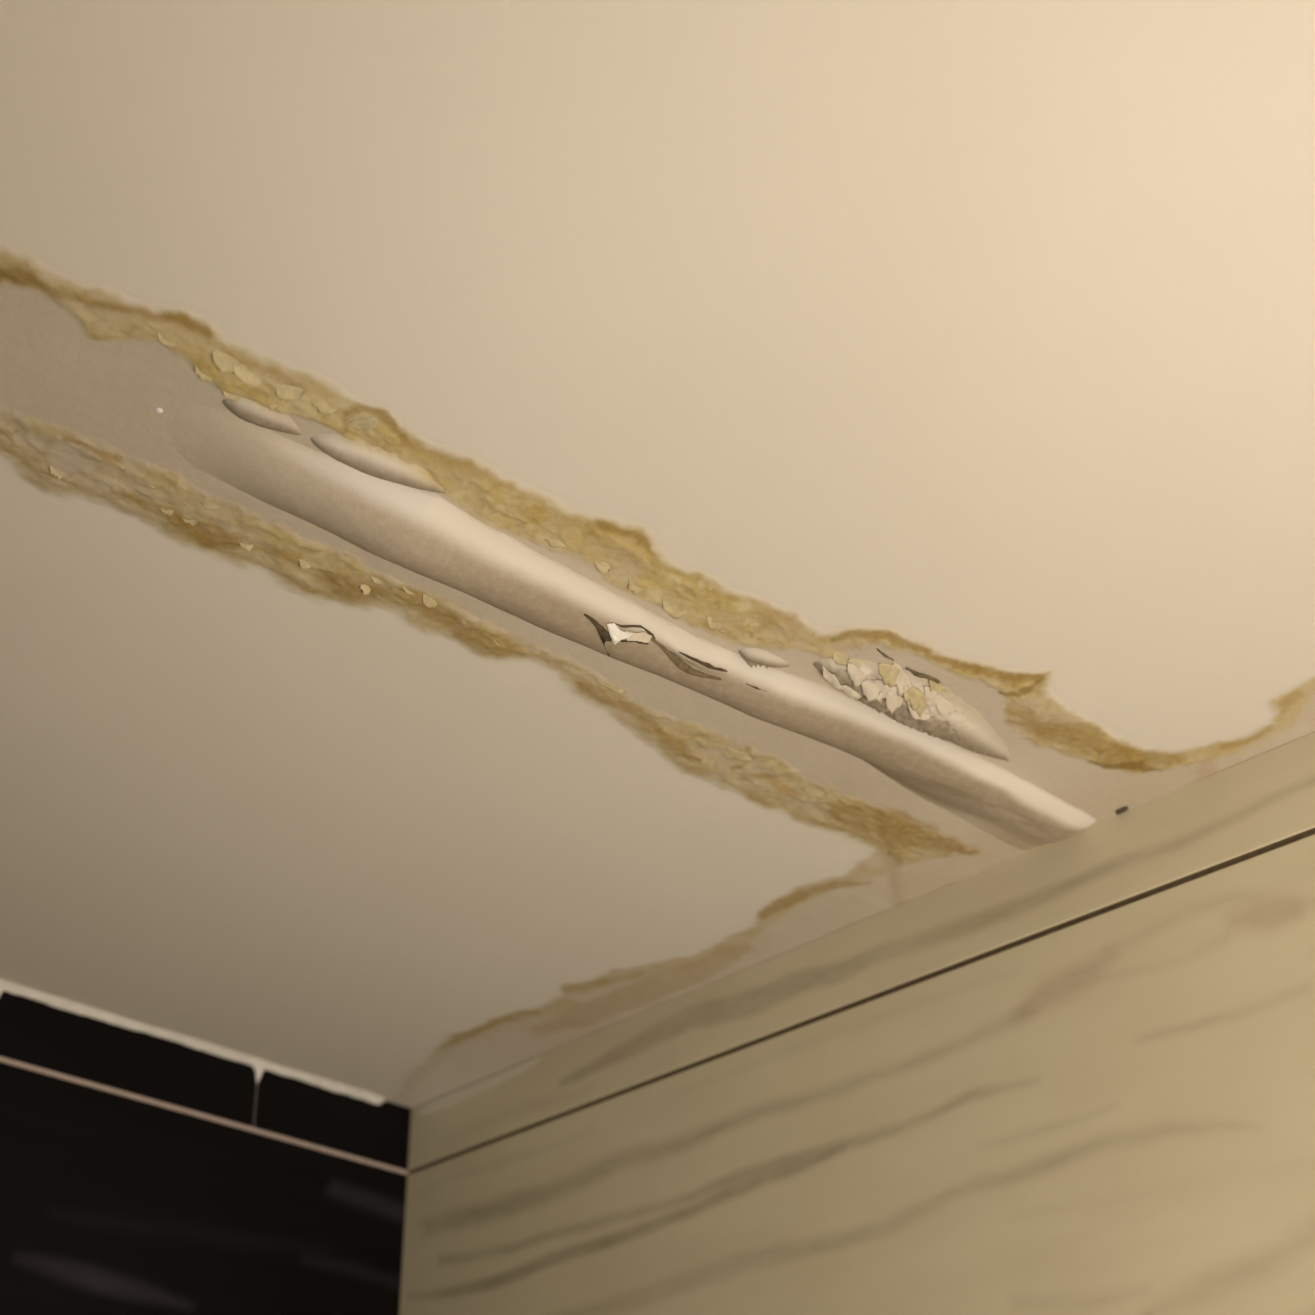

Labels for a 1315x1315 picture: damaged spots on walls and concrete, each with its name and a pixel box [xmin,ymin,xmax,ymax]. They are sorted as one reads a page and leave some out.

peeling [195,350,337,415]
peeling [360,575,385,595]
leakage [0,238,1315,1108]
peeling [821,648,957,720]